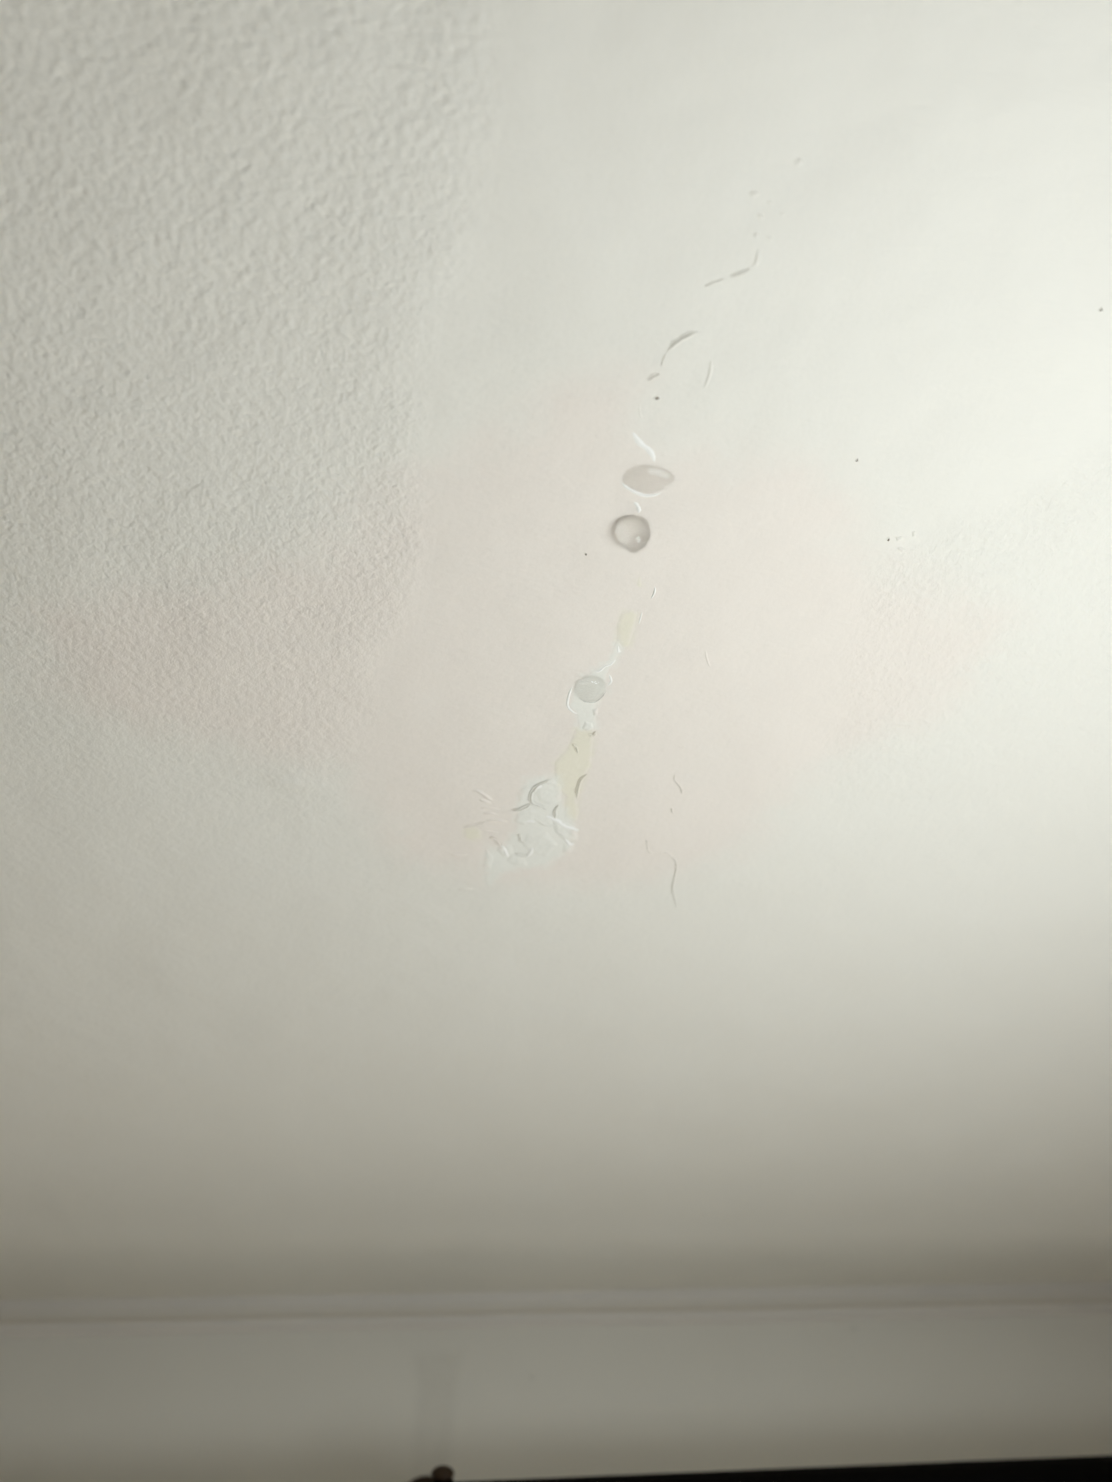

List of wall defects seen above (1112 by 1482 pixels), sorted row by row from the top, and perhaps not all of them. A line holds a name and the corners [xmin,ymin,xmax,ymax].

crack [704,247,761,287]
crack [639,331,713,419]
crack [645,745,685,908]